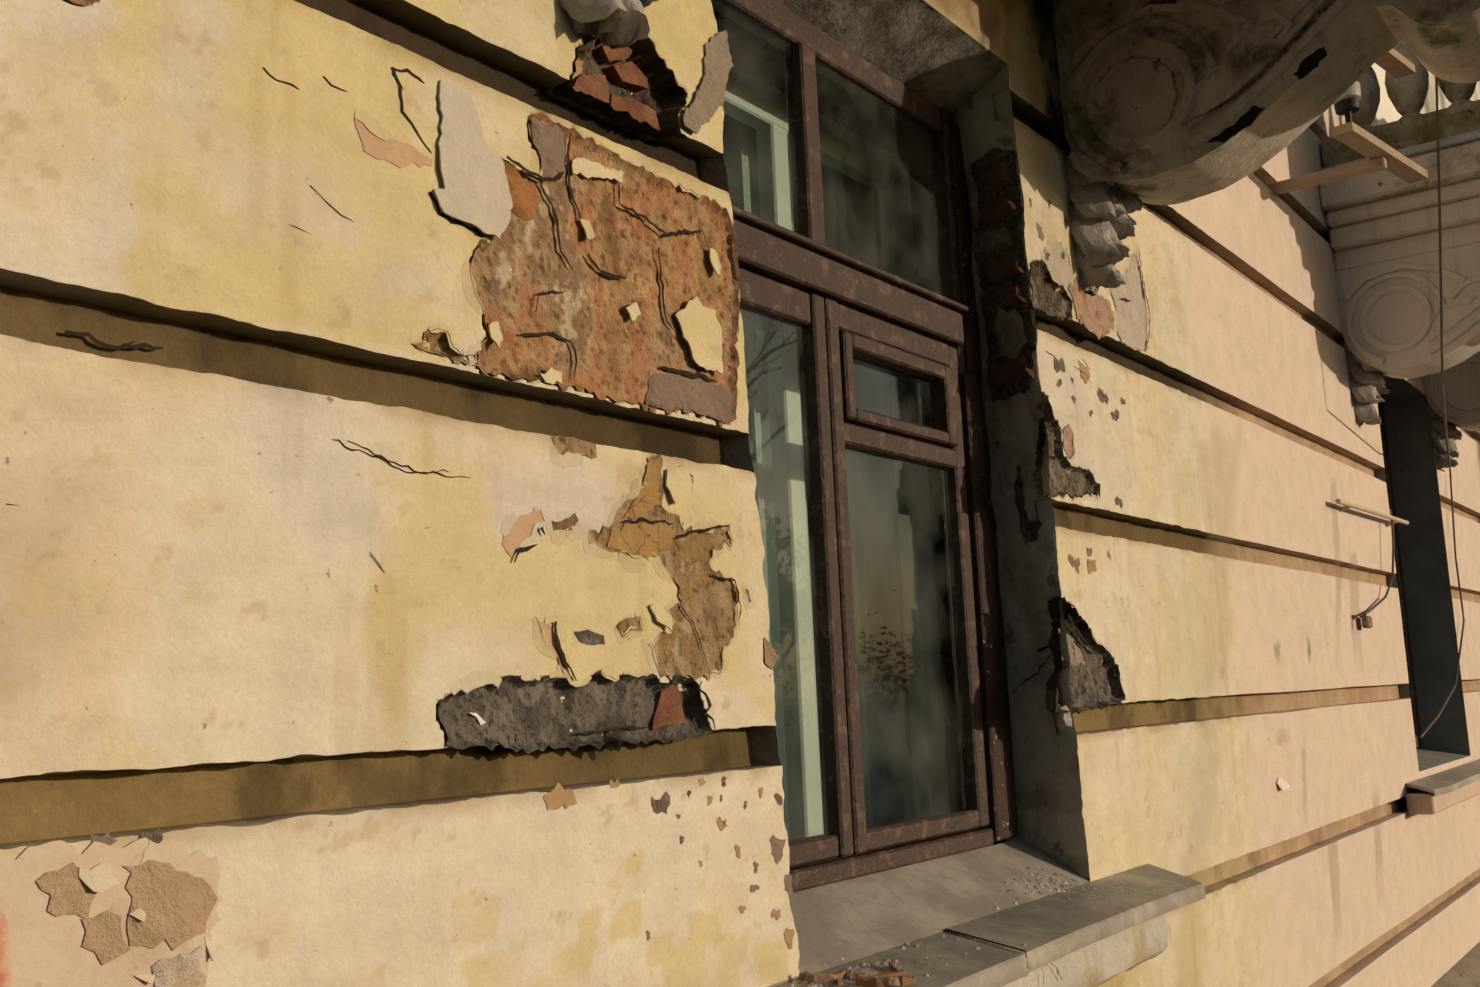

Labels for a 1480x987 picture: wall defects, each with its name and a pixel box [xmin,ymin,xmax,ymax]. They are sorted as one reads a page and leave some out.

crack [263,68,348,92]
crack [391,67,432,153]
crack [291,185,354,233]
crack [428,189,491,241]
peeling [413,80,740,428]
flaking render [970,148,1150,508]
crack [332,439,470,478]
spalling [436,455,755,754]
spalling [1045,596,1125,714]